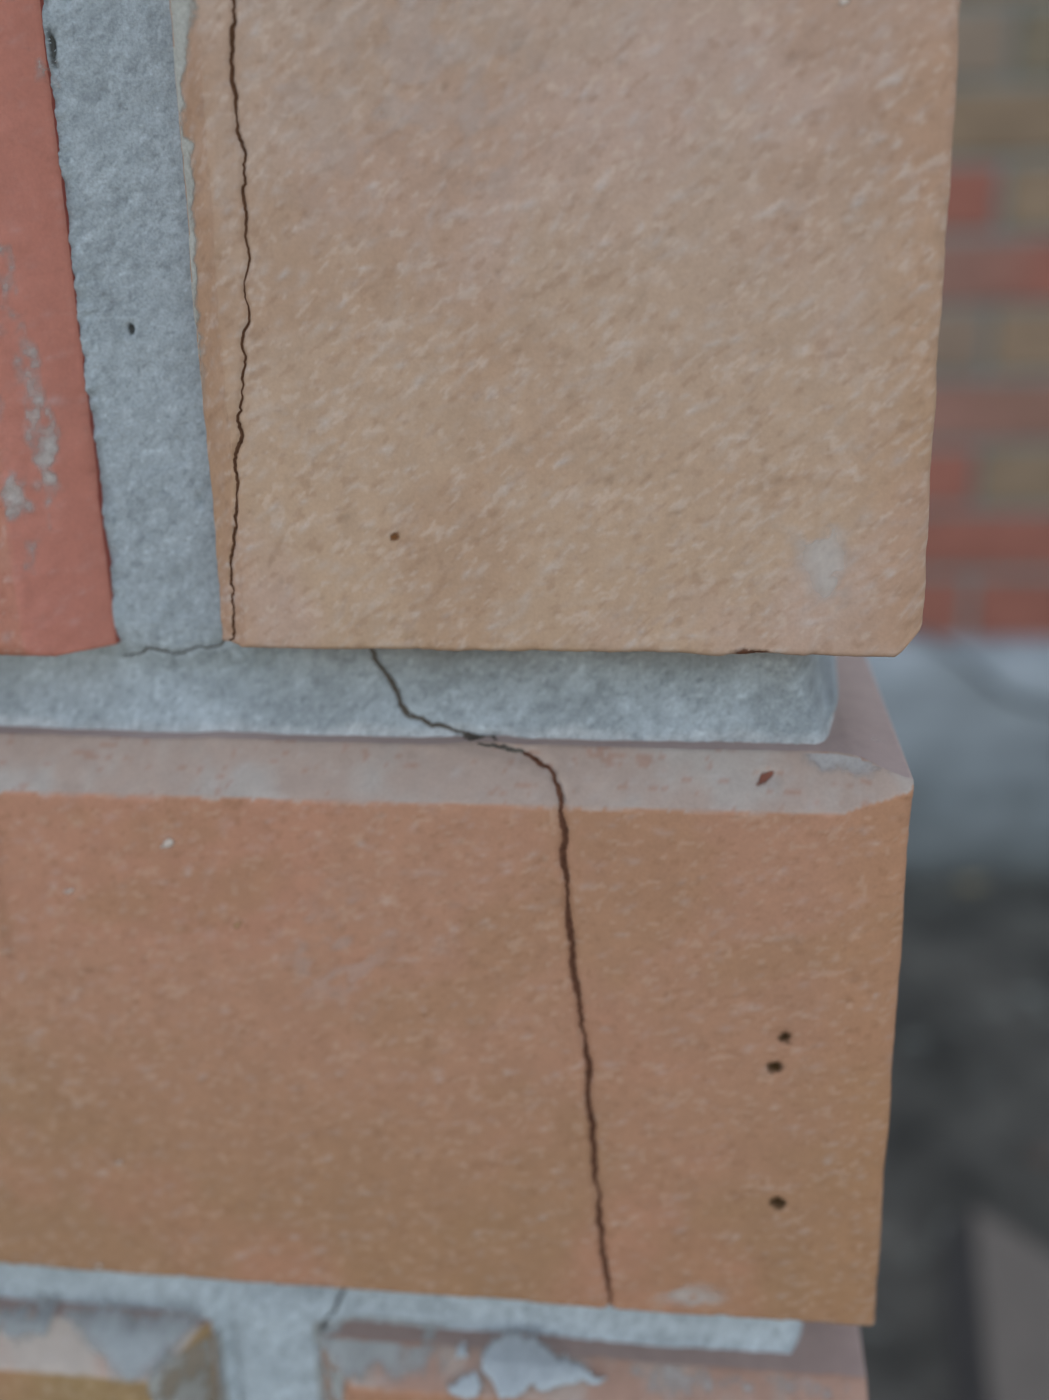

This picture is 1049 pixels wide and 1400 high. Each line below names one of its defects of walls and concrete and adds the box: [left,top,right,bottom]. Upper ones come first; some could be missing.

crack [124,0,251,658]
peeling [18,348,58,484]
peeling [2,477,31,518]
crack [369,649,612,1303]
peeling [447,1331,607,1400]